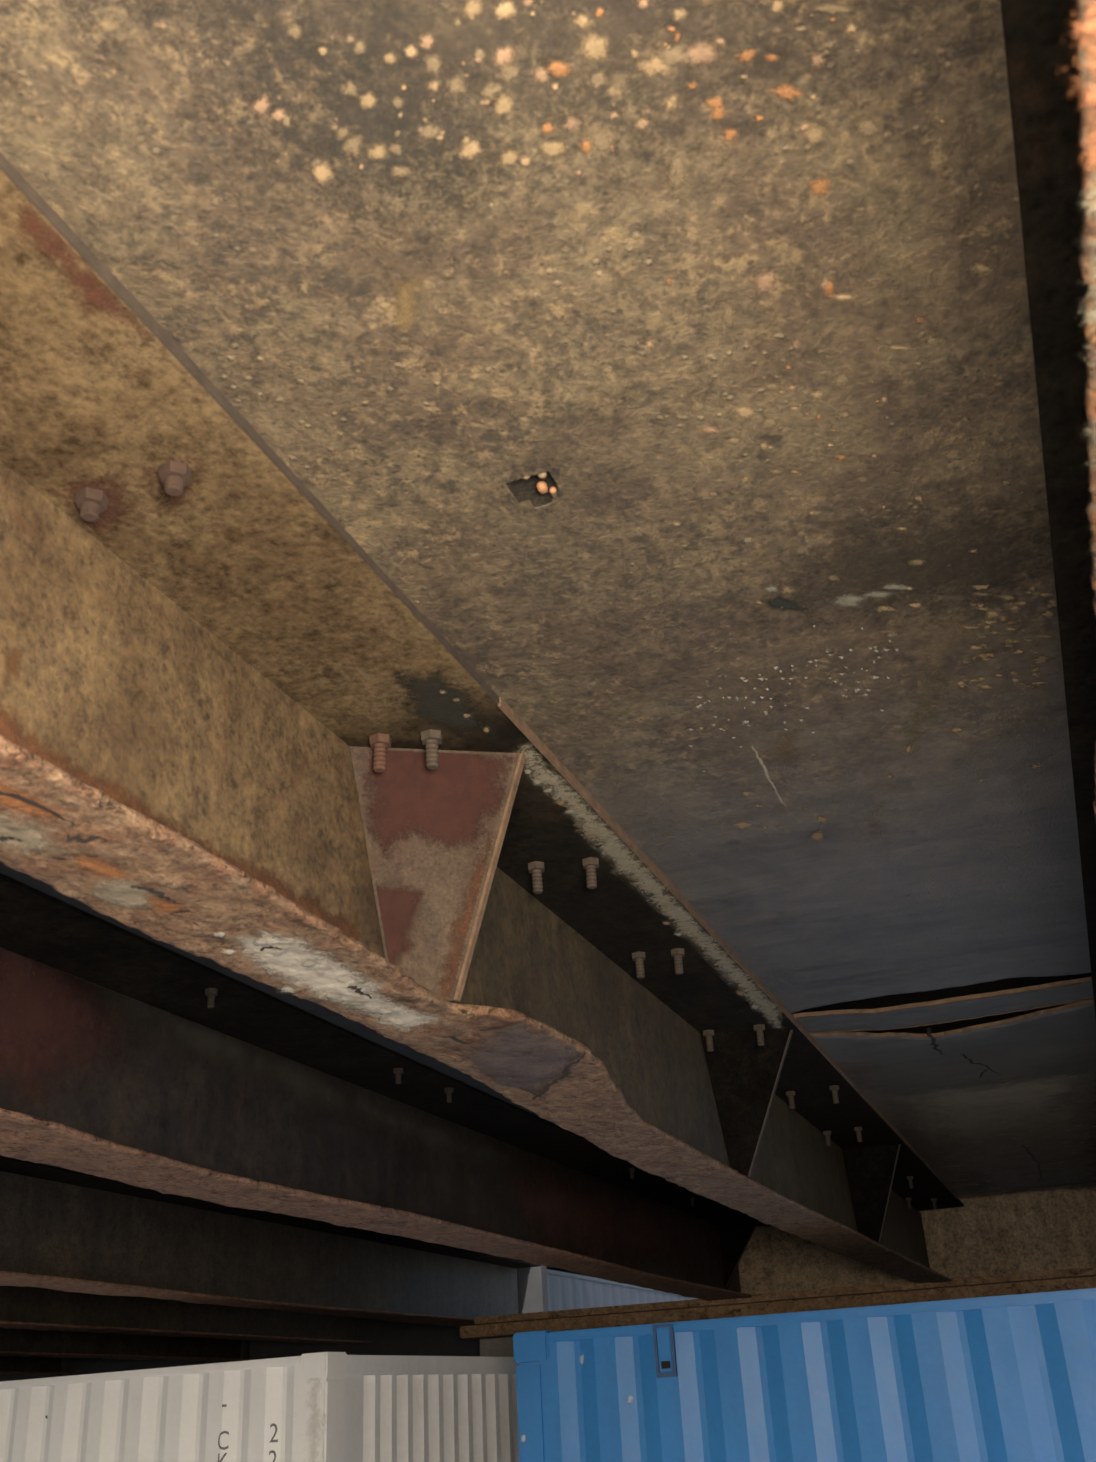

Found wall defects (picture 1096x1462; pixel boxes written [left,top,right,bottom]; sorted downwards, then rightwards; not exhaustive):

water stain [67,0,944,230]
corrosion [1073,0,1096,169]
spalling [494,457,568,514]
water stain [777,503,1051,624]
corrosion [0,710,359,940]
corrosion [376,886,423,964]
corrosion [439,838,492,998]
crack [794,979,1083,1079]